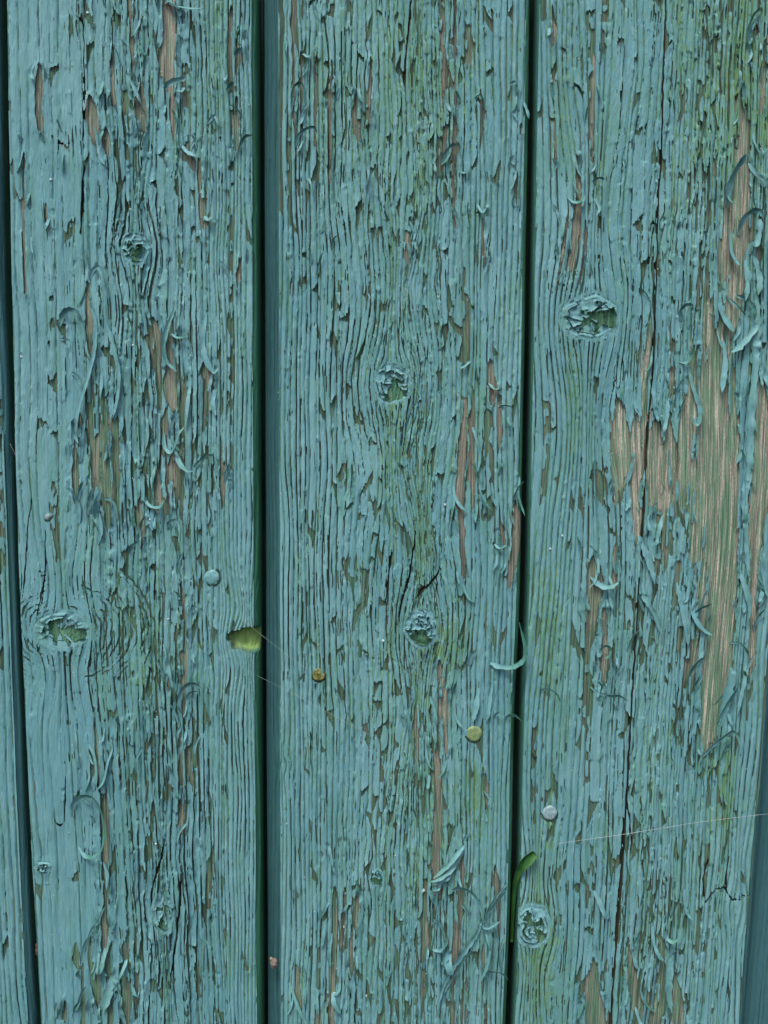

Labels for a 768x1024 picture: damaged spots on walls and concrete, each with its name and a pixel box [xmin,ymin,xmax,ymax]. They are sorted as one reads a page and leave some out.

peeling [89,0,220,243]
peeling [284,0,375,201]
peeling [552,45,605,287]
peeling [58,249,233,847]
peeling [451,384,525,603]
peeling [575,535,639,705]
crack [609,0,666,1024]
peeling [608,8,768,765]
peeling [54,724,138,1024]
peeling [286,846,368,1024]
peeling [399,658,522,1024]
crack [702,856,748,903]